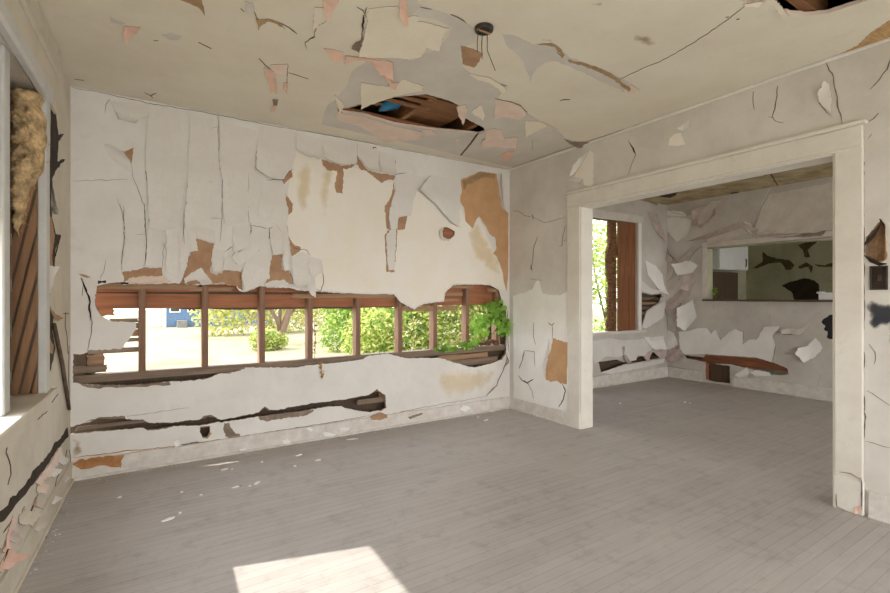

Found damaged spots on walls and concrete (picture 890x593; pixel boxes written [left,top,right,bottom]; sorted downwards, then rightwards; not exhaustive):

crack [621,6,745,79]
crack [817,63,842,121]
spalling [50,110,65,292]
peeling [105,0,567,411]
spalling [864,219,887,266]
spalling [50,307,63,371]
crack [399,311,554,413]
peeling [593,183,833,378]
damp [871,305,890,326]
flaking render [173,415,240,448]
flaking render [259,407,314,422]
flaking render [0,428,72,573]